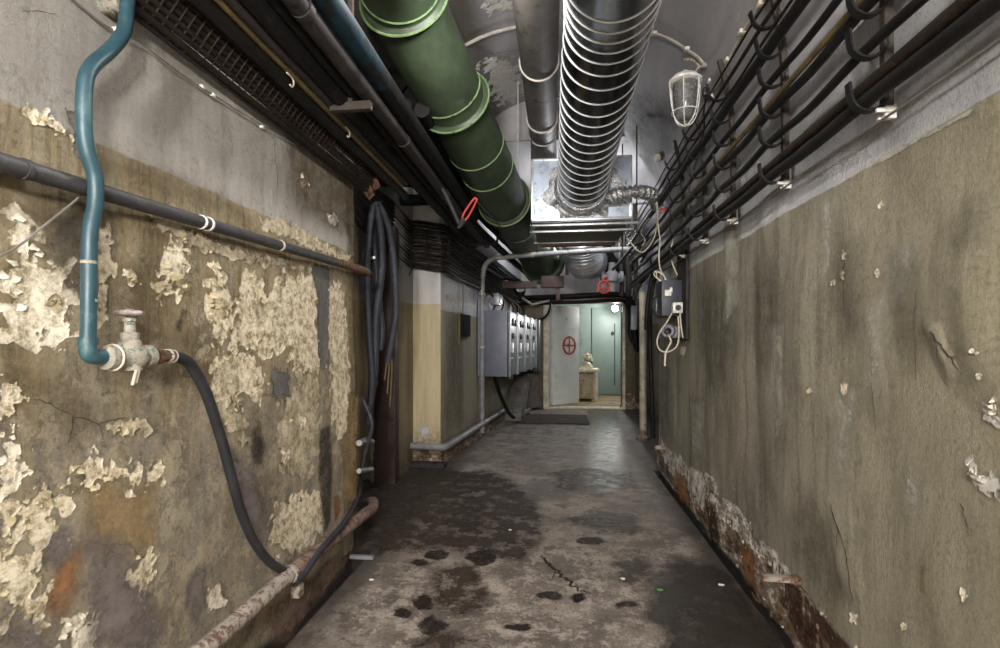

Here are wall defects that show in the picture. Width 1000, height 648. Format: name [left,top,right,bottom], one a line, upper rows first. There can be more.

peeling [18,102,80,157]
peeling [0,201,80,354]
crack [913,292,961,376]
crack [34,399,120,443]
peeling [97,212,351,559]
peeling [981,397,1000,429]
peeling [960,451,1000,501]
peeling [0,373,166,648]
rust [705,500,721,544]
damp [344,470,542,648]
crack [540,556,591,594]
rust [780,583,849,648]